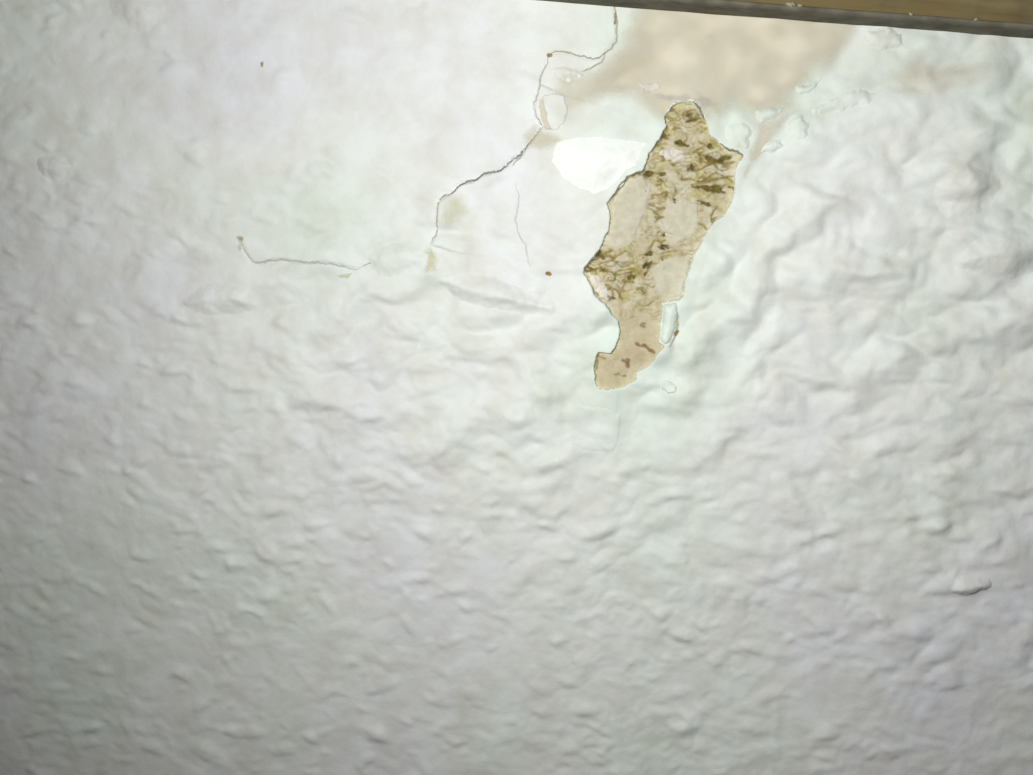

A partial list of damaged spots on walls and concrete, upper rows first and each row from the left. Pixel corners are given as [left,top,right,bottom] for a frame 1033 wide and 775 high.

crack [547,7,618,69]
damp [865,27,904,51]
damp [598,9,878,159]
crack [438,126,542,203]
flaking render [584,102,743,389]